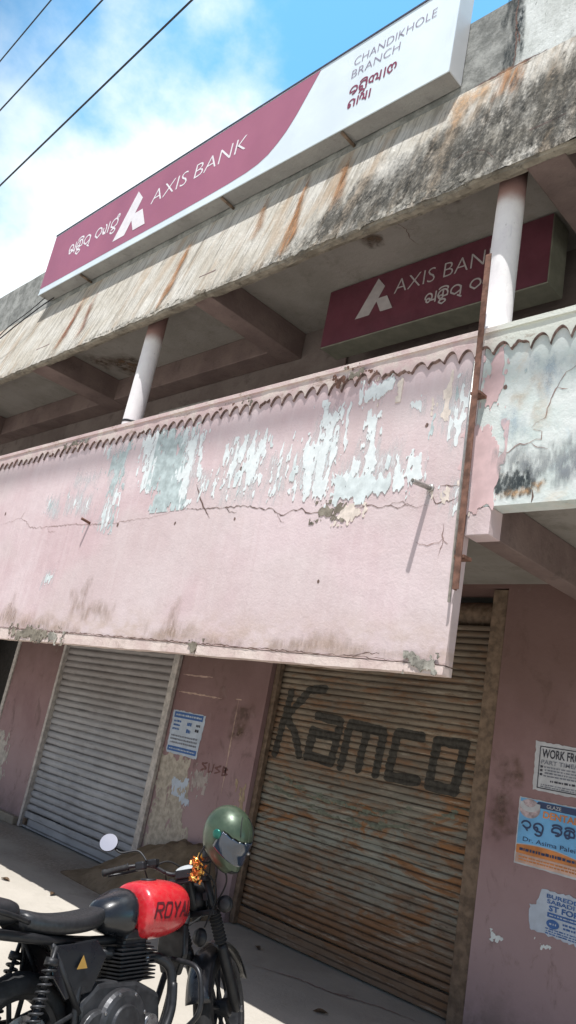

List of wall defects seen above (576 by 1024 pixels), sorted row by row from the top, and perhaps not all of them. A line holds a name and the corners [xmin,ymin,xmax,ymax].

damp [317,47,576,242]
corrosion [280,181,309,254]
damp [0,324,576,471]
peeling [44,344,510,534]
damp [495,439,576,499]
crack [9,487,334,533]
crack [361,484,458,555]
spalling [401,650,440,676]